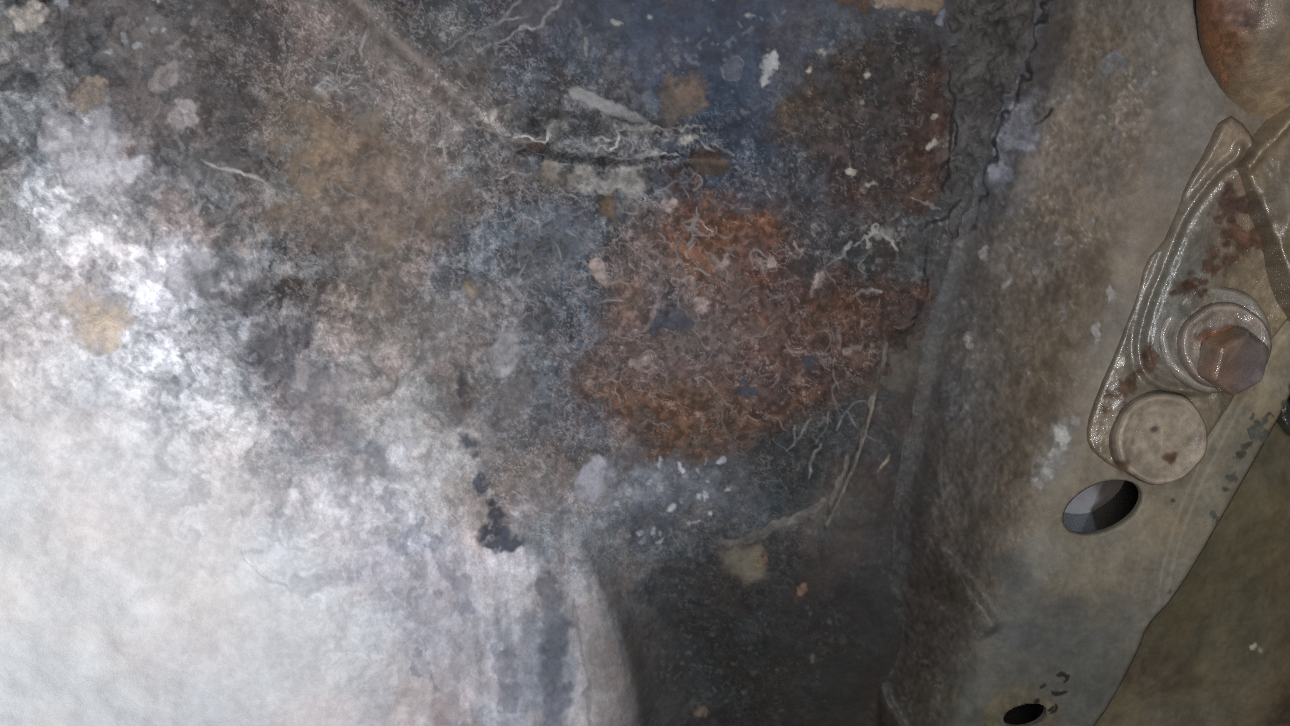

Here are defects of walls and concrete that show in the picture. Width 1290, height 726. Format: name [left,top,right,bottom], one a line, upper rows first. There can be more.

peeling [874,0,945,26]
crack [1015,1,1053,119]
crack [923,73,989,230]
crack [991,131,999,162]
rust [573,199,933,461]